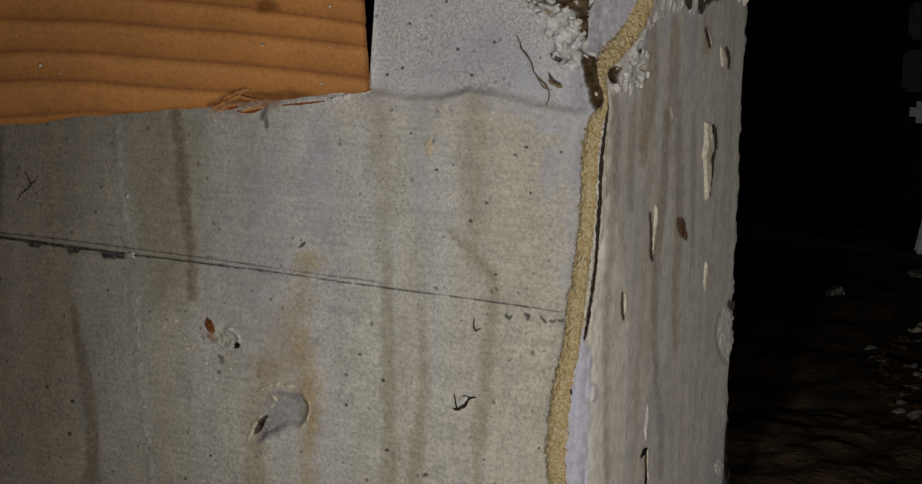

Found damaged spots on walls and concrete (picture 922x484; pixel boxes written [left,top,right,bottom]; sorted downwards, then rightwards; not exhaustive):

spalling [524,0,637,72]
peeling [705,27,731,69]
rust [205,317,215,339]
spalling [248,382,311,444]